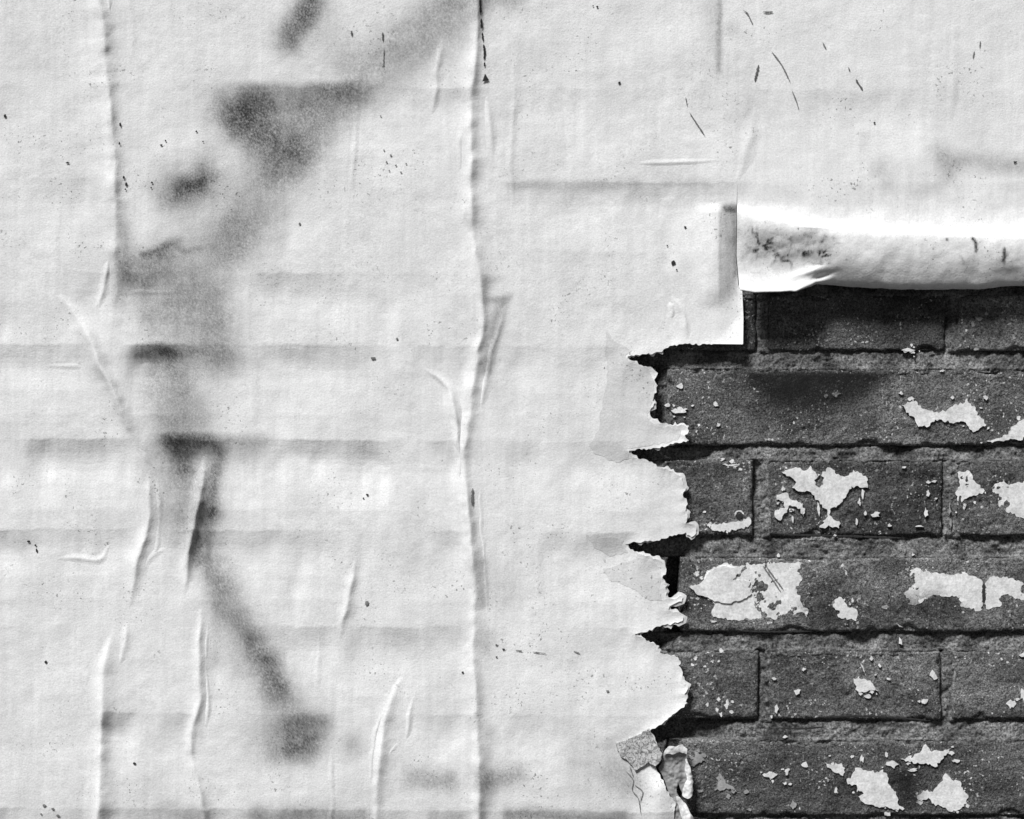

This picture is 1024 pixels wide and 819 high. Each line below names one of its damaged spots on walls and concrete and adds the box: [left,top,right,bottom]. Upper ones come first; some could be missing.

peeling [899,391,1024,443]
peeling [703,510,751,534]
peeling [774,466,892,536]
peeling [943,470,1024,534]
peeling [690,553,808,623]
peeling [829,597,859,624]
peeling [904,553,1024,613]
peeling [854,656,891,698]
peeling [690,744,706,771]
peeling [697,773,749,799]
peeling [760,762,808,785]
peeling [826,744,969,816]